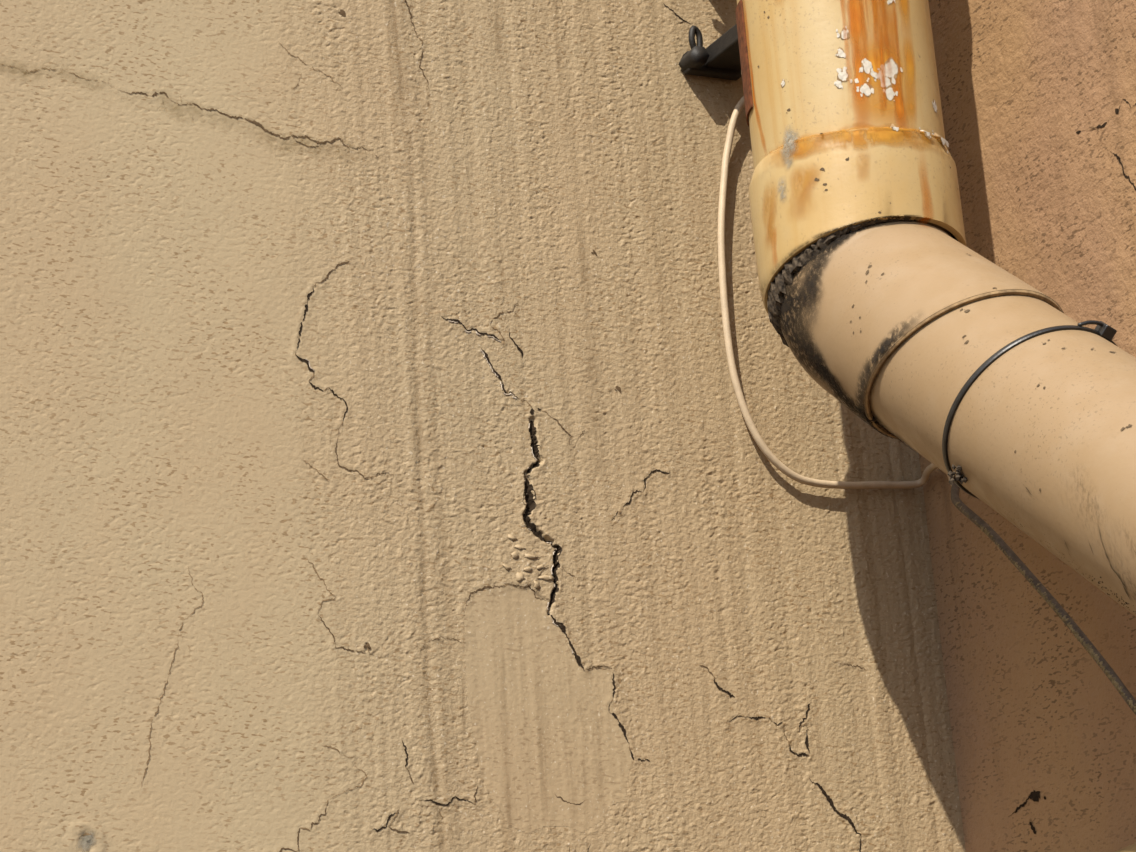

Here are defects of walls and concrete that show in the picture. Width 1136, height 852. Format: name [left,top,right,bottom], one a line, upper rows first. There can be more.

crack [2,64,377,156]
rust [782,0,933,157]
peeling [834,26,903,101]
peeling [919,127,949,153]
crack [1076,99,1136,190]
crack [295,261,394,481]
crack [440,301,650,761]
crack [612,469,671,520]
crack [308,561,370,653]
crack [279,745,367,852]
crack [374,740,478,833]
crack [700,665,862,852]